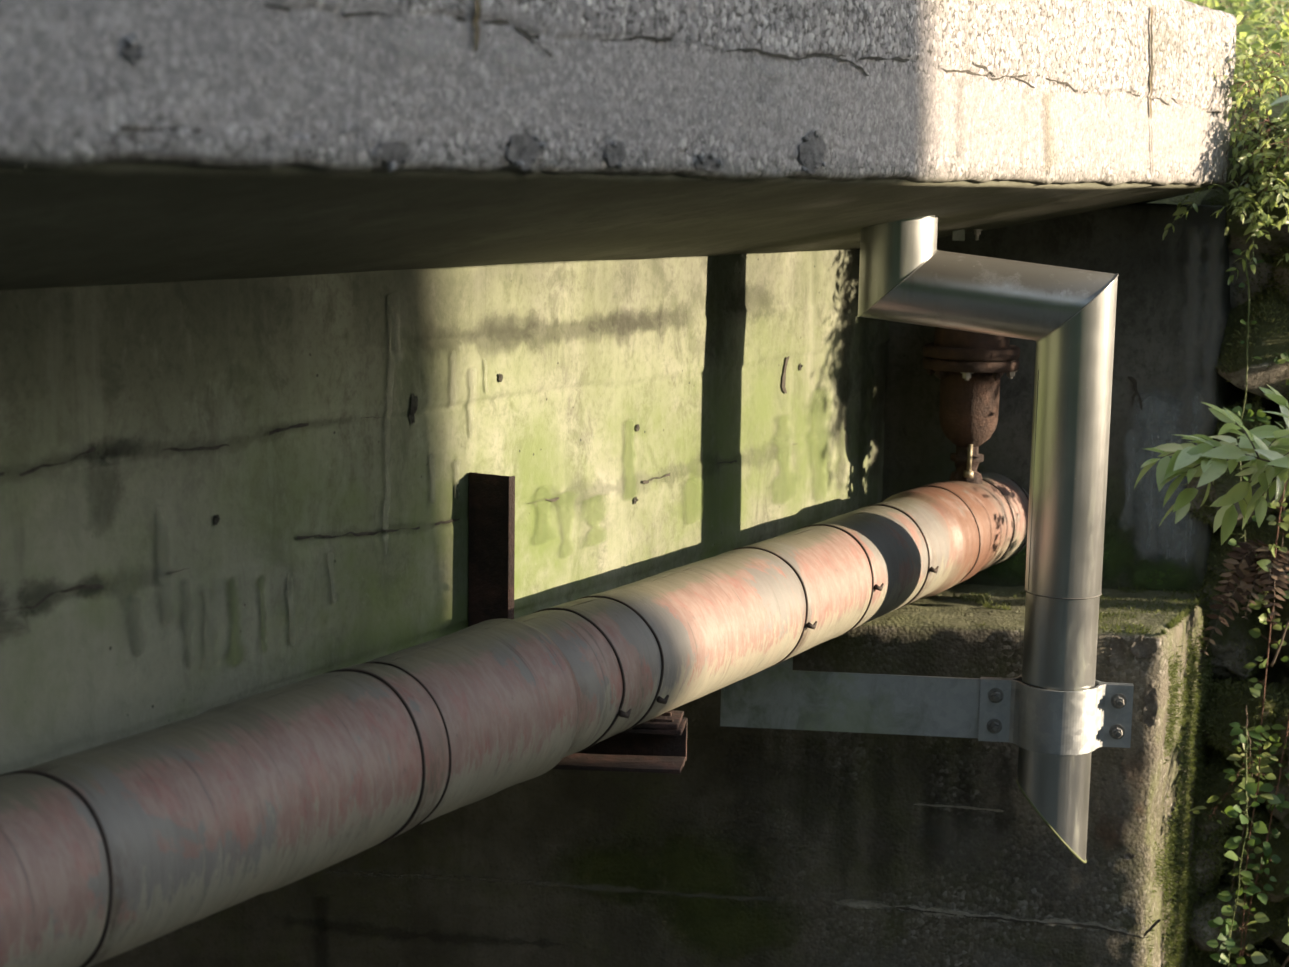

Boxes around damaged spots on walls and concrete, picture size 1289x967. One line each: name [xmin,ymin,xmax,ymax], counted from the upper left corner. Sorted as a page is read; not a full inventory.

crack [265,3,290,12]
crack [343,10,402,18]
crack [456,16,552,57]
crack [602,36,909,76]
crack [942,62,1088,93]
crack [1127,91,1228,113]
spalling [508,131,546,170]
spalling [799,129,826,174]
crack [268,423,309,435]
crack [0,447,96,476]
crack [163,444,229,452]
crack [297,518,460,540]